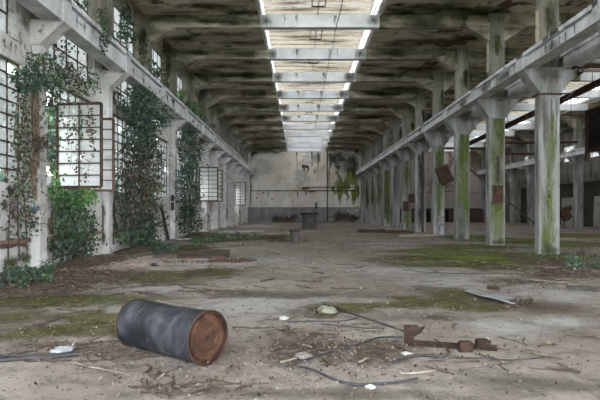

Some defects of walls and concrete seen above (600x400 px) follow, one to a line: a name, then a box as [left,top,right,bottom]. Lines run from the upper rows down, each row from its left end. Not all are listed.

damp [164,4,257,64]
damp [240,73,268,95]
damp [368,66,440,77]
damp [543,100,557,140]
damp [330,153,357,176]
damp [331,166,399,200]